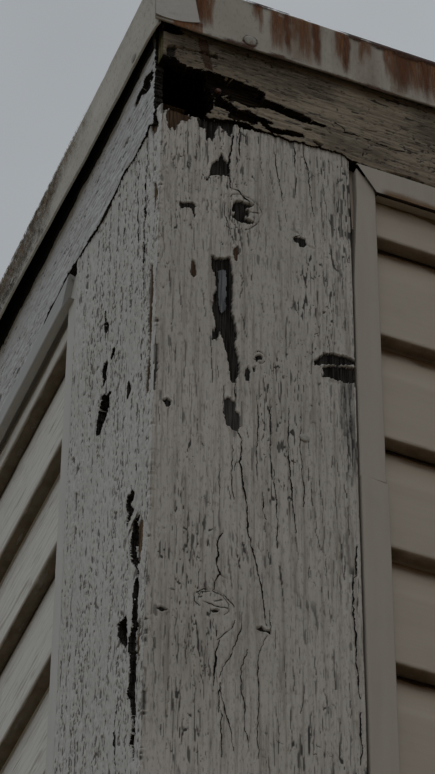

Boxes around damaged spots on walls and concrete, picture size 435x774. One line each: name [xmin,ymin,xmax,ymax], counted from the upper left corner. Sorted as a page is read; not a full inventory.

peeling [135,70,154,106]
rust [173,0,214,70]
rust [252,1,321,59]
rust [336,31,435,93]
peeling [163,110,234,188]
crack [124,137,149,287]
peeling [211,246,239,432]
peeling [127,509,138,536]
crack [194,396,313,759]